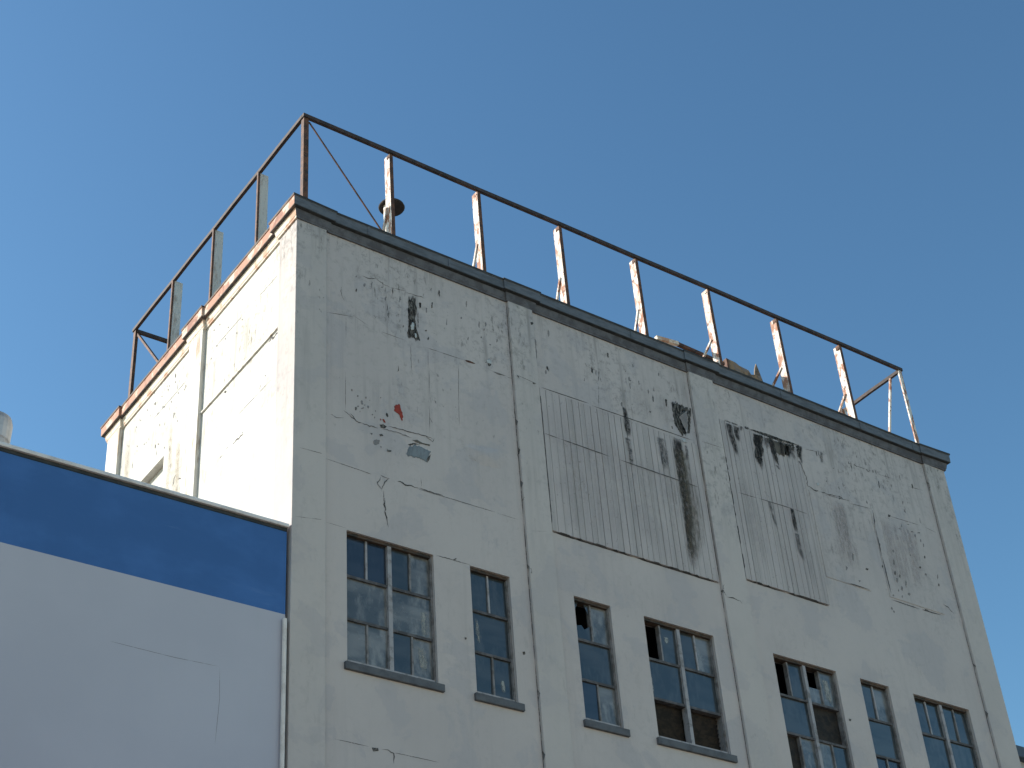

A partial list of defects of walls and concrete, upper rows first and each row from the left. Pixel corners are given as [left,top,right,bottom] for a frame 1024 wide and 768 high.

spalling [403,290,440,341]
peeling [371,404,403,436]
spalling [652,397,691,442]
peeling [407,440,431,462]
damp [727,421,805,473]
crack [366,472,443,527]
damp [659,438,700,552]